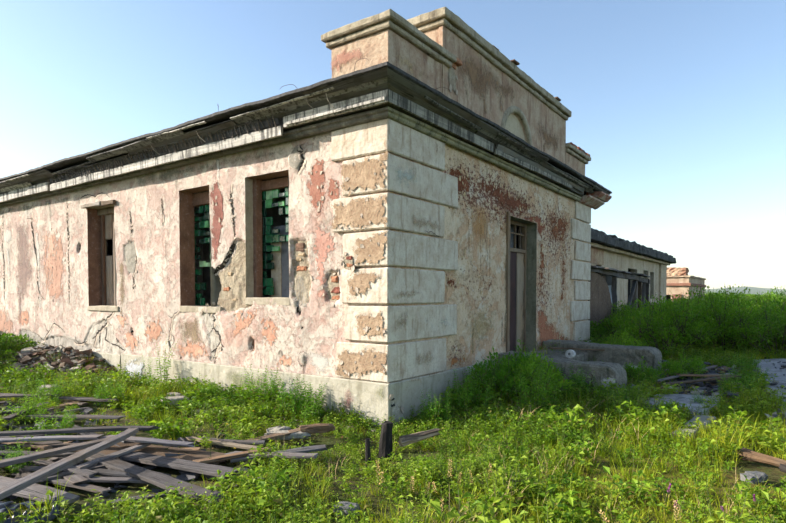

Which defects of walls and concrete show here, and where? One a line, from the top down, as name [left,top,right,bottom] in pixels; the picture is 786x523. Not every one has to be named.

crack [27,212,43,308]
crack [66,192,109,305]
crack [214,183,237,275]
spalling [177,182,292,367]
spalling [289,147,355,307]
peeling [450,168,569,306]
crack [41,312,124,350]
crack [167,311,180,357]
crack [206,313,223,364]